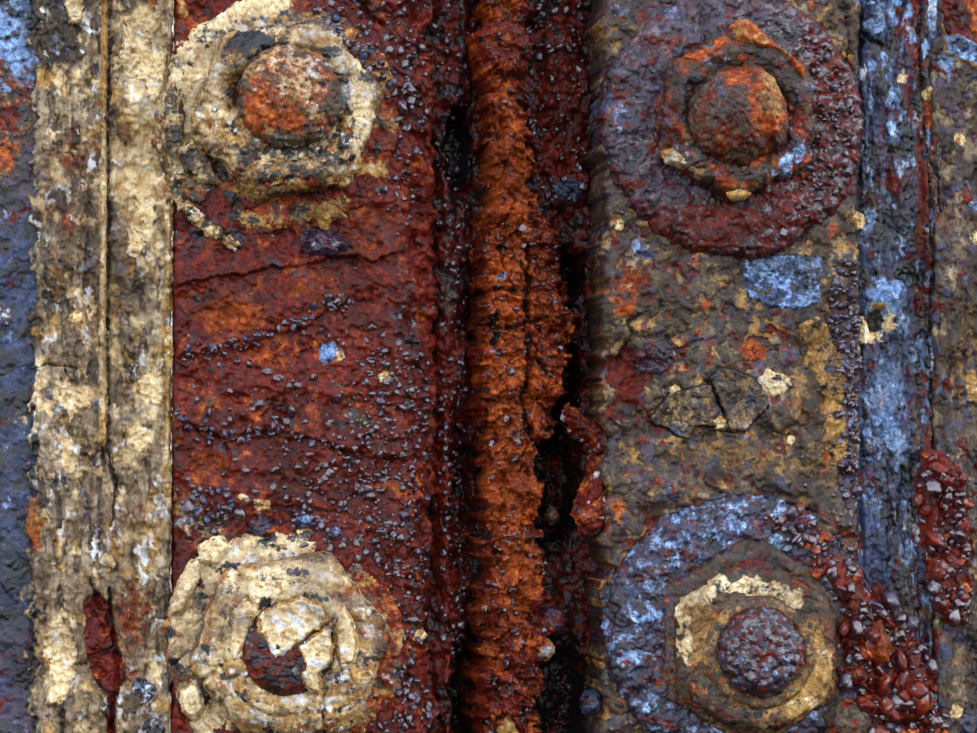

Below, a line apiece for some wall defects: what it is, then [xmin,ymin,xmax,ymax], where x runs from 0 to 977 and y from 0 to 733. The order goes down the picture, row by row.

rust [311,0,470,221]
rust [434,0,588,332]
rust [661,147,705,180]
rust [684,19,859,218]
rust [299,201,348,257]
rust [485,269,572,391]
rust [174,274,469,660]
peeling [166,535,233,618]
rust [482,414,568,703]
peeling [179,679,214,733]
peeling [229,596,359,695]
rust [376,629,433,733]